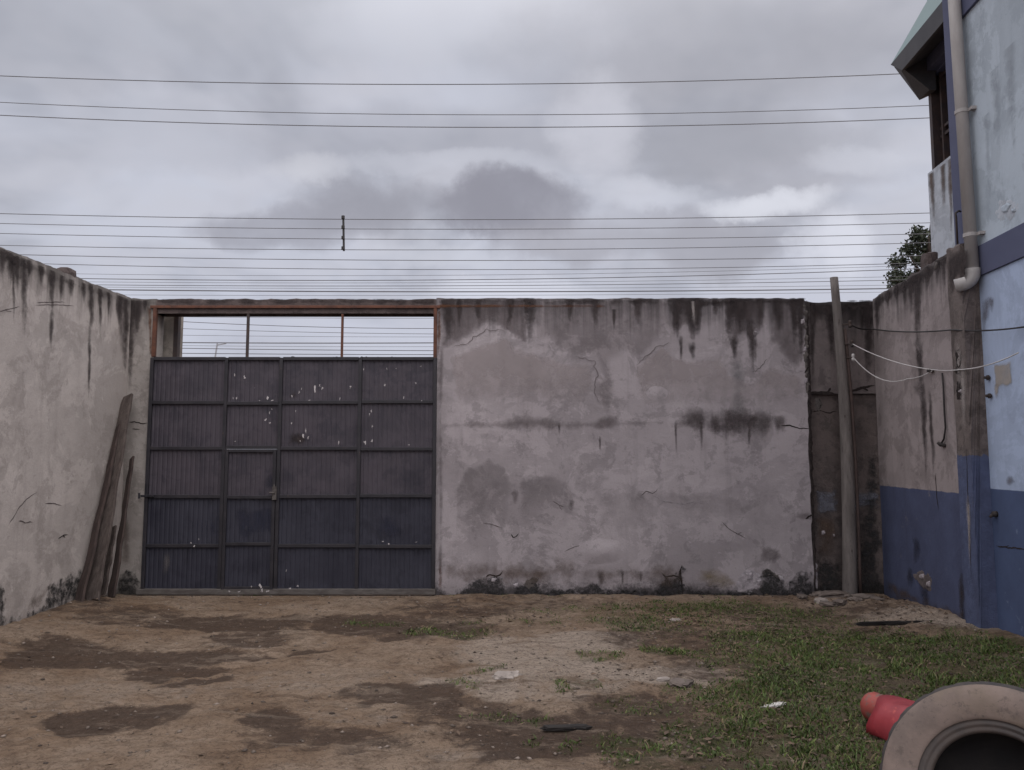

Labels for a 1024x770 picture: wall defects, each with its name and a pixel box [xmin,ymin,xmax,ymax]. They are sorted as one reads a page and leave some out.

damp [0,248,146,355]
damp [499,298,535,328]
damp [566,299,599,319]
damp [613,298,652,323]
damp [921,400,934,454]
mould [27,572,81,616]
damp [460,560,842,596]